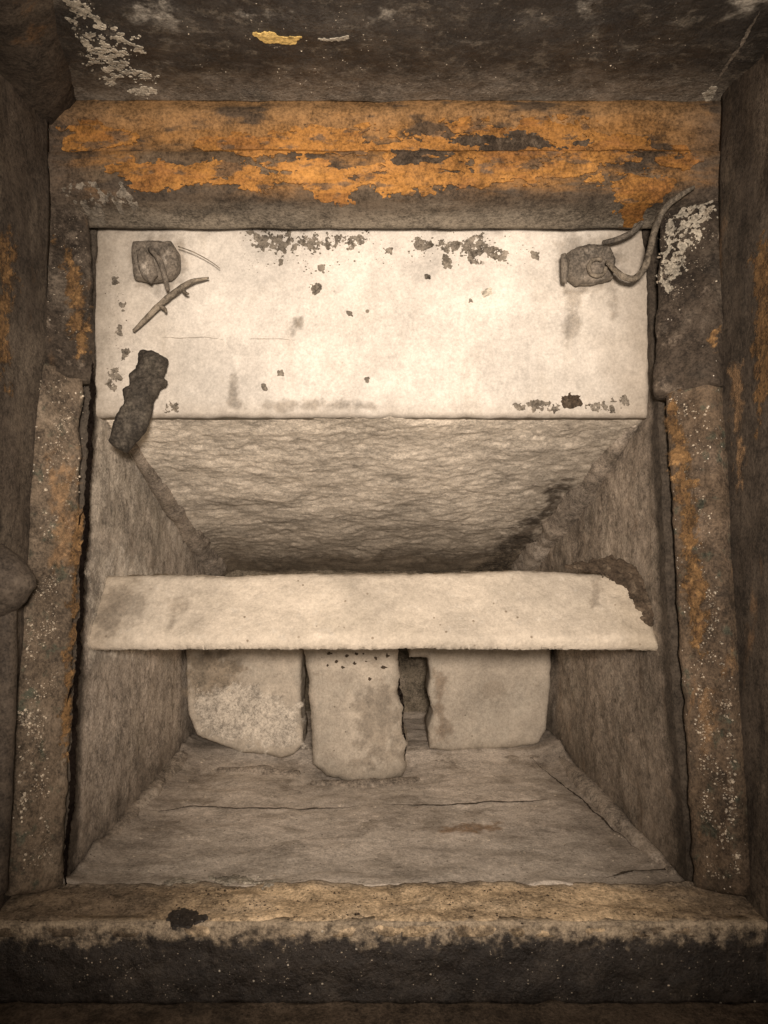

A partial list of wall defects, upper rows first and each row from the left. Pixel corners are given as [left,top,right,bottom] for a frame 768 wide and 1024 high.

spalling [240,229,393,295]
spalling [407,232,540,269]
spalling [511,392,630,414]
corrosion [664,390,710,657]
crack [63,361,96,886]
spalling [565,555,654,627]
crack [150,757,672,877]